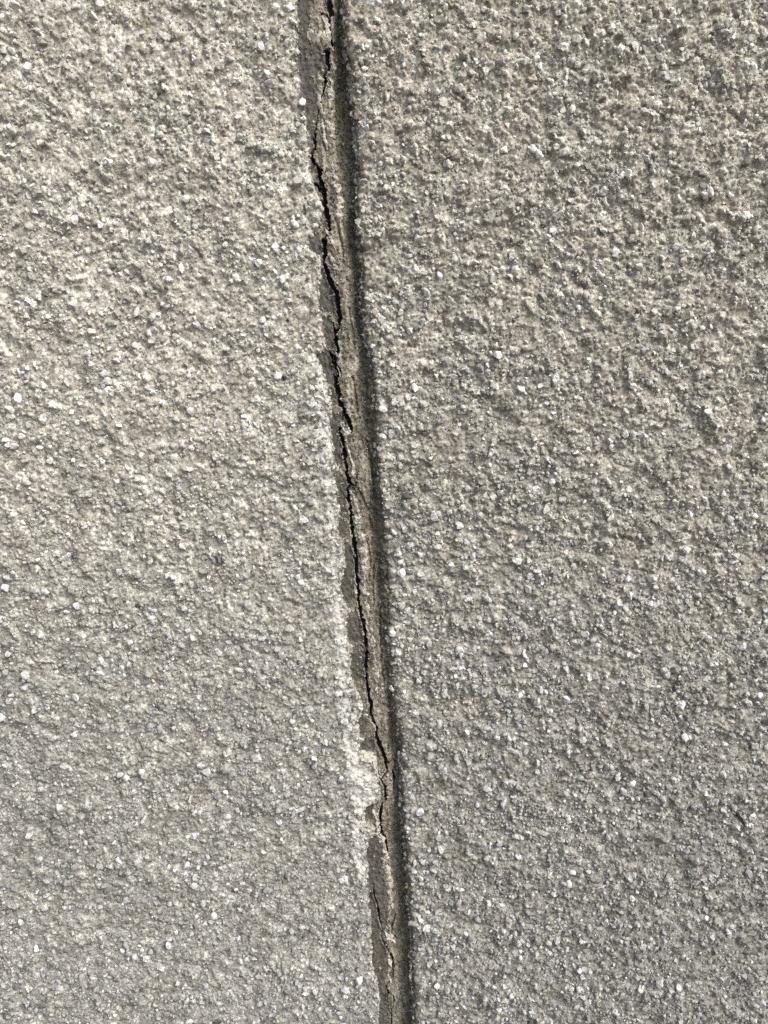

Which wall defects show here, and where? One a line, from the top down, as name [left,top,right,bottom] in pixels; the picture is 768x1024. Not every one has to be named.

crack [310,0,395,847]
crack [373,883,400,1024]